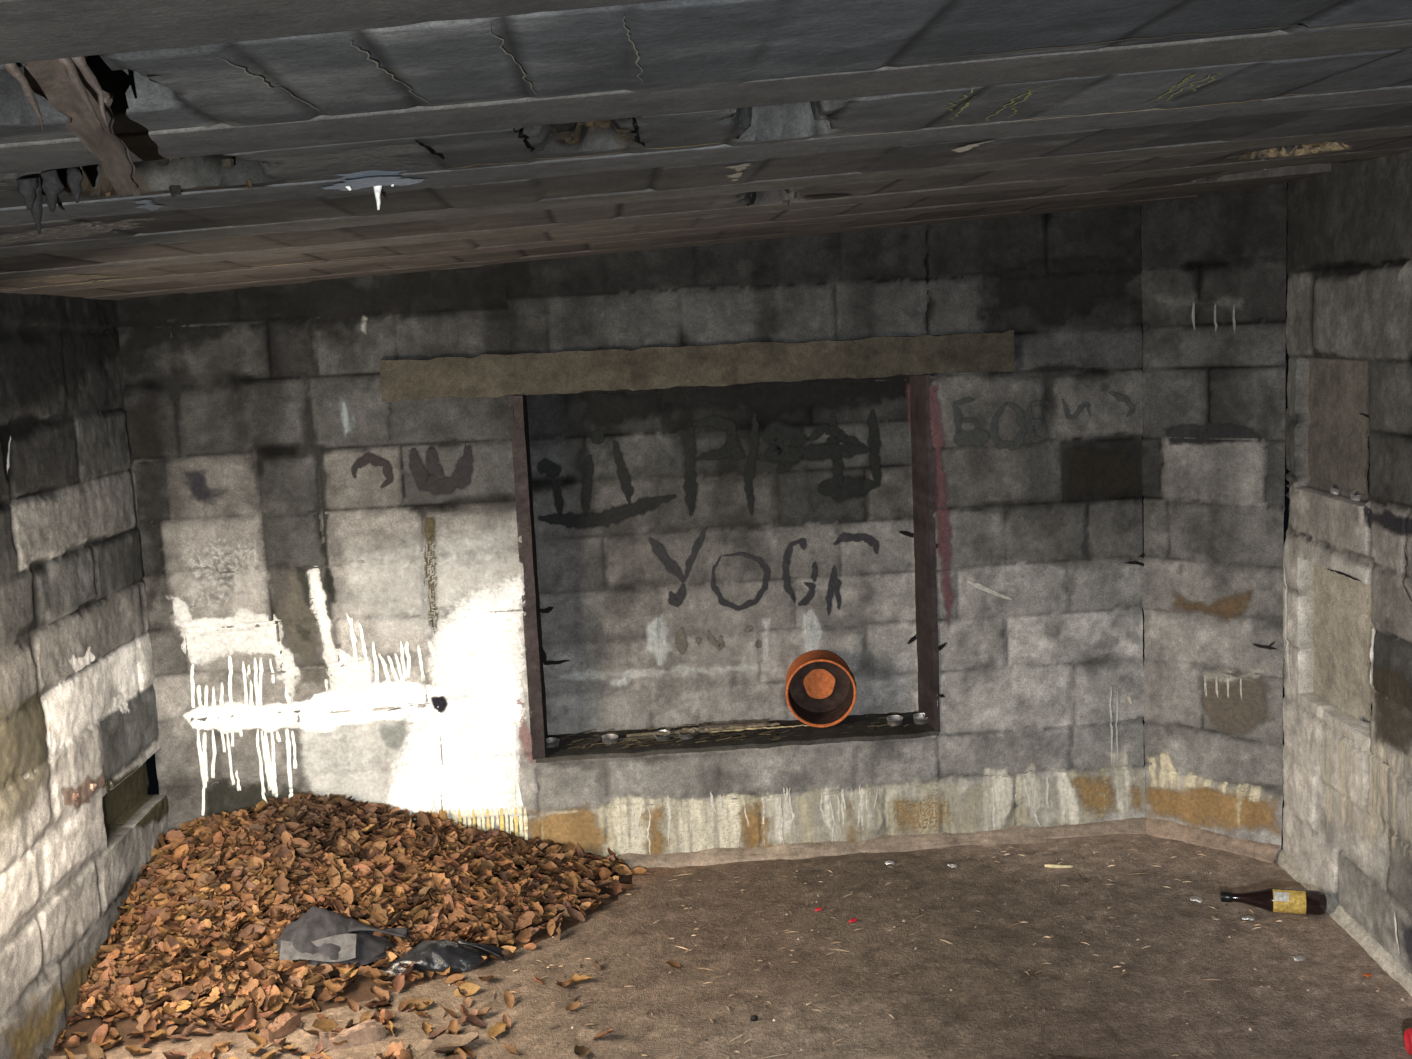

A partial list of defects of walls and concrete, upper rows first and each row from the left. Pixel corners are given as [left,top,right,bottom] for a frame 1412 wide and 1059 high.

spalling [1239,142,1352,170]
spalling [42,164,117,198]
spalling [133,176,266,197]
water stain [383,722,405,747]
water stain [594,686,1272,859]